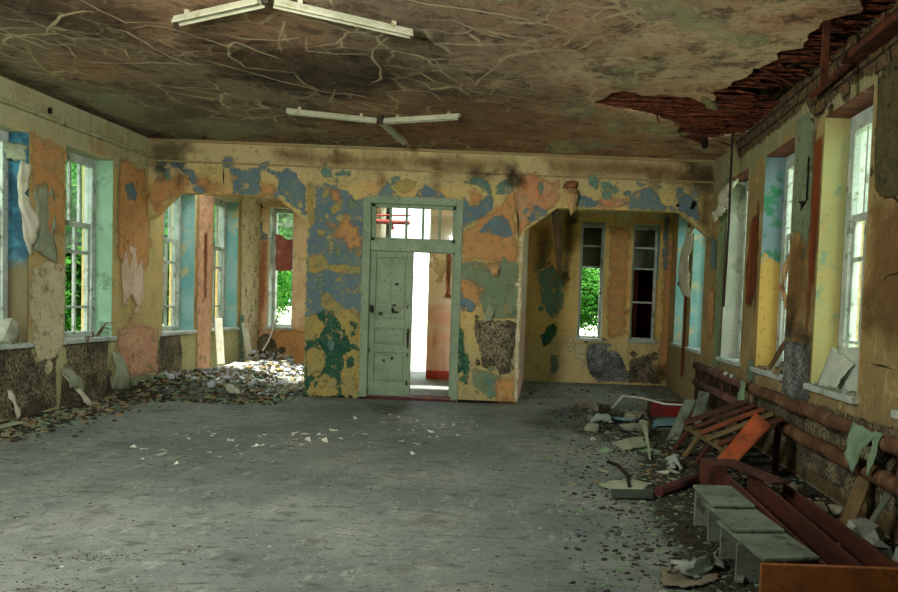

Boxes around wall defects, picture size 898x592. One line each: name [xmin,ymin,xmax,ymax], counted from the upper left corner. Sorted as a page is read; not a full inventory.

peeling [31,133,67,236]
spalling [0,158,219,420]
crack [0,0,411,117]
peeling [221,156,409,398]
peeling [457,170,547,402]
peeling [535,230,565,347]
crack [408,0,698,105]
peeling [577,175,699,384]
peeling [698,208,848,451]
spalling [735,2,898,261]
spalling [779,333,898,438]
spalling [859,445,898,477]